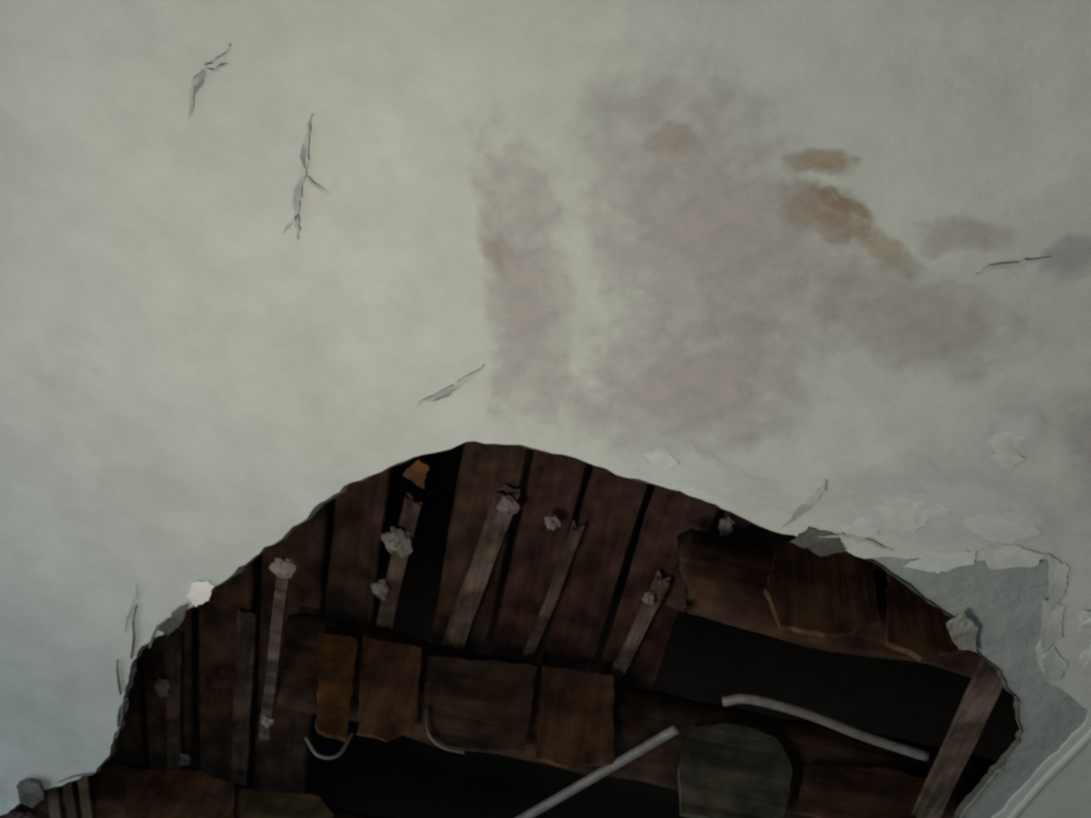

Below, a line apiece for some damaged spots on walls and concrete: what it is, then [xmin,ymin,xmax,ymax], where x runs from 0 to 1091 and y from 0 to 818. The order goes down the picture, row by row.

crack [188,45,230,119]
crack [283,116,328,241]
rust [793,152,843,170]
spalling [58,441,484,786]
flaking render [501,444,1088,818]
spalling [3,779,45,815]